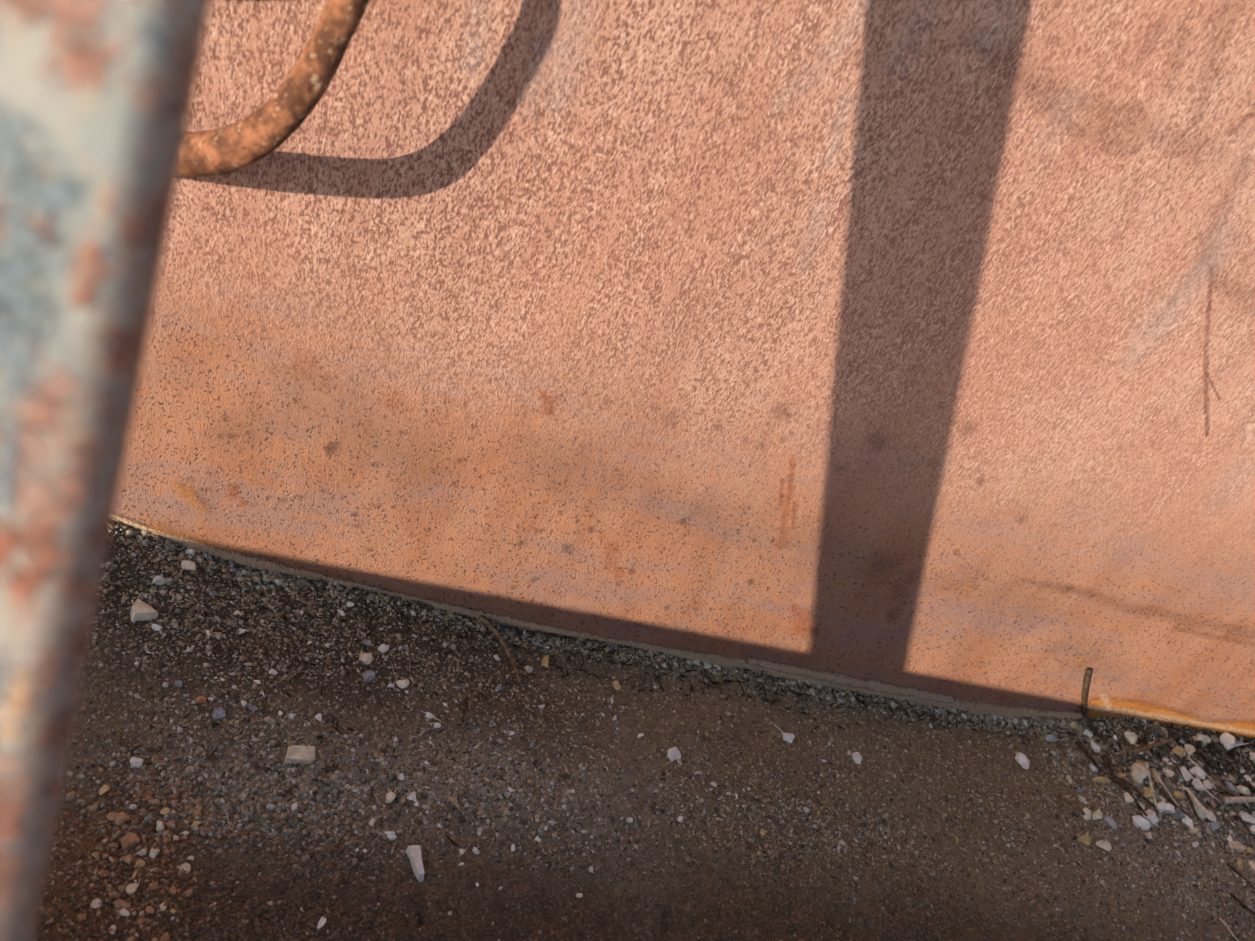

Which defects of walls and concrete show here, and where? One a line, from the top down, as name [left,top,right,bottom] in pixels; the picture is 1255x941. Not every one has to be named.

corrosion [1082,698,1255,739]